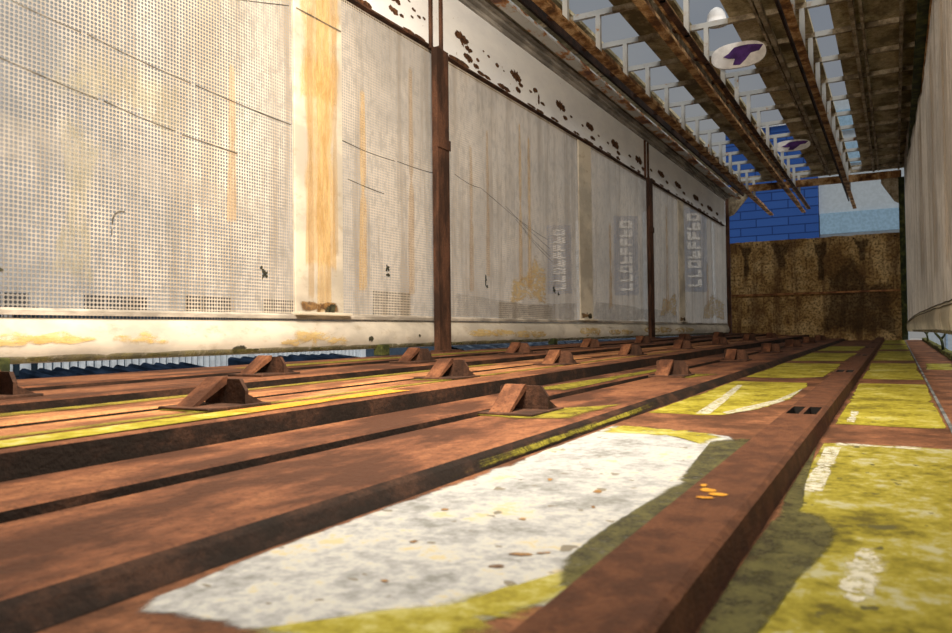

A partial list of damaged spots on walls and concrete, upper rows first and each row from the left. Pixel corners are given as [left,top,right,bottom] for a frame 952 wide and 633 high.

peeling [389,0,426,20]
corrosion [449,54,510,92]
peeling [455,30,718,216]